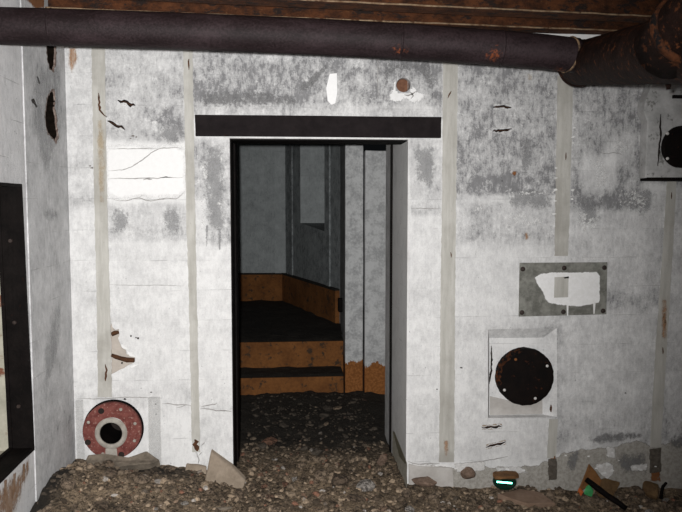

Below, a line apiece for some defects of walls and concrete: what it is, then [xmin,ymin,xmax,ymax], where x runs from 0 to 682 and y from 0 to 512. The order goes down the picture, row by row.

spalling [46,46,57,73]
spalling [44,89,59,144]
leakage [205,91,294,104]
flaking render [389,79,425,103]
crack [110,147,185,201]
leakage [206,150,223,249]
flaking render [111,324,138,374]
corrosion [0,462,29,512]
peeling [452,440,682,492]